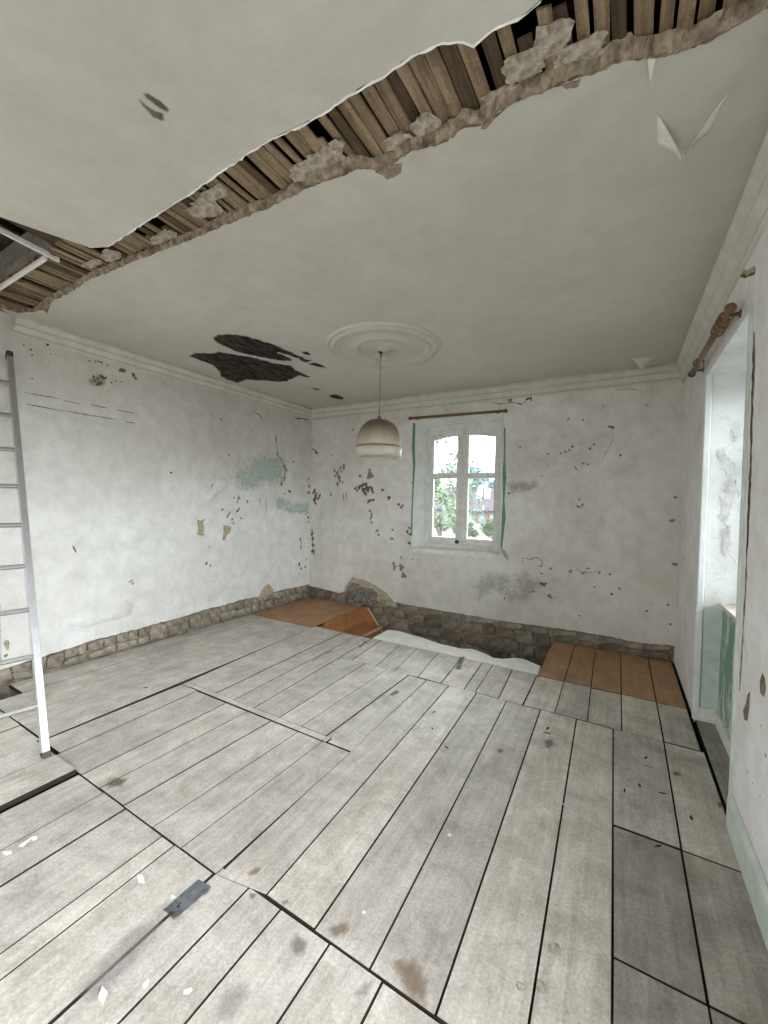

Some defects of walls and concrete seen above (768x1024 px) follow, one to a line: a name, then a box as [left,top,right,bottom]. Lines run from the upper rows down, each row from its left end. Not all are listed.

spalling [0,0,768,313]
crack [275,418,309,493]
damp [279,477,321,570]
peeling [330,464,411,545]
peeling [716,333,766,721]
flaking render [0,577,670,685]